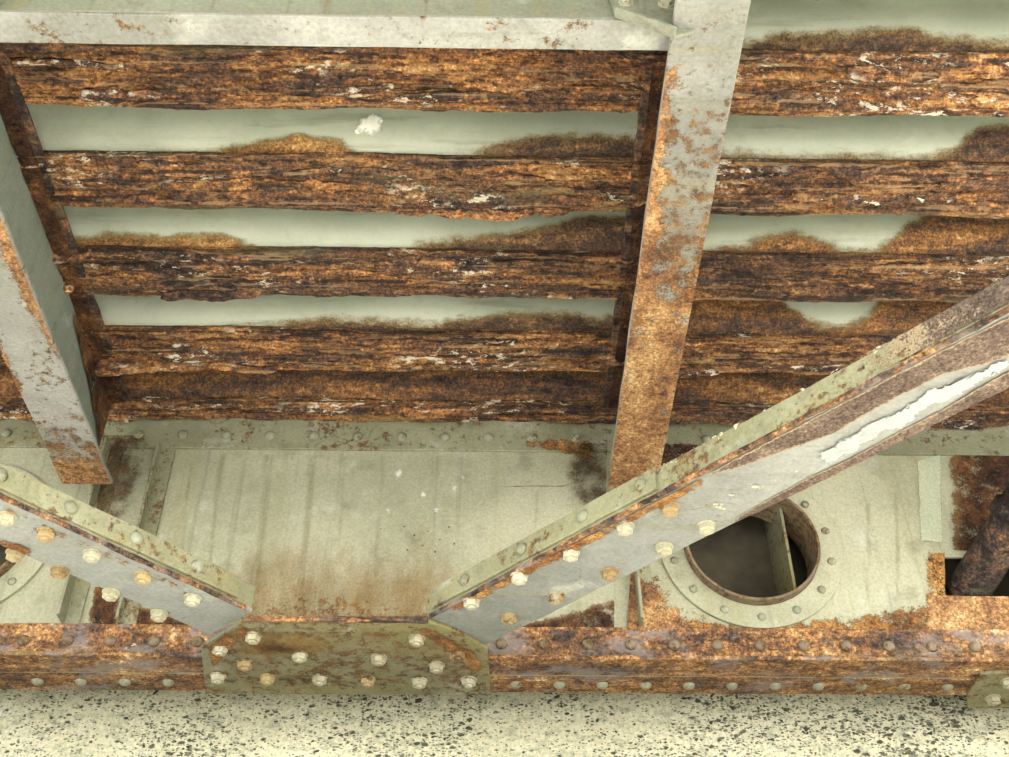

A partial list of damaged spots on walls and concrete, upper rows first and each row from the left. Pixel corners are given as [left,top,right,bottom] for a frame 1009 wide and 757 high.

corrosion [742,27,1009,54]
corrosion [0,50,1009,517]
peeling [708,318,1009,475]
peeling [734,372,1009,522]
corrosion [0,541,31,556]
corrosion [453,480,703,610]
corrosion [782,455,1009,630]
corrosion [89,587,119,624]
corrosion [136,608,187,625]
corrosion [522,601,614,627]
corrosion [627,567,735,632]
corrosion [208,626,483,687]